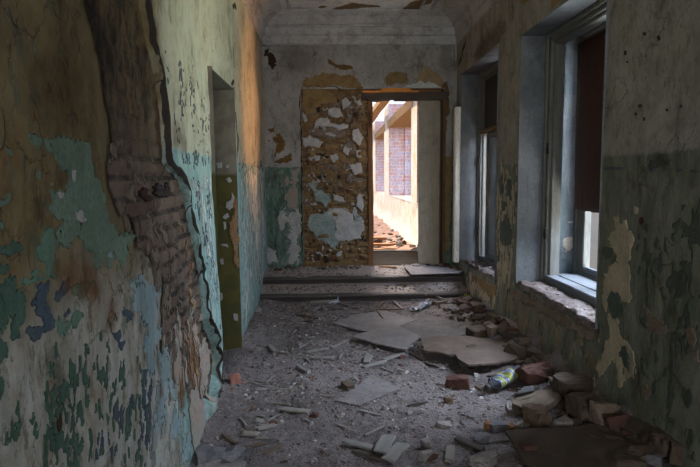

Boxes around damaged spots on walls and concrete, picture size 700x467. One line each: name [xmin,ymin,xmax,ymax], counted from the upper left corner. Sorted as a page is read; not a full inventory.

flaking render [0,0,278,467]
crack [145,0,223,398]
flaking render [268,59,367,264]
peeling [592,198,700,427]